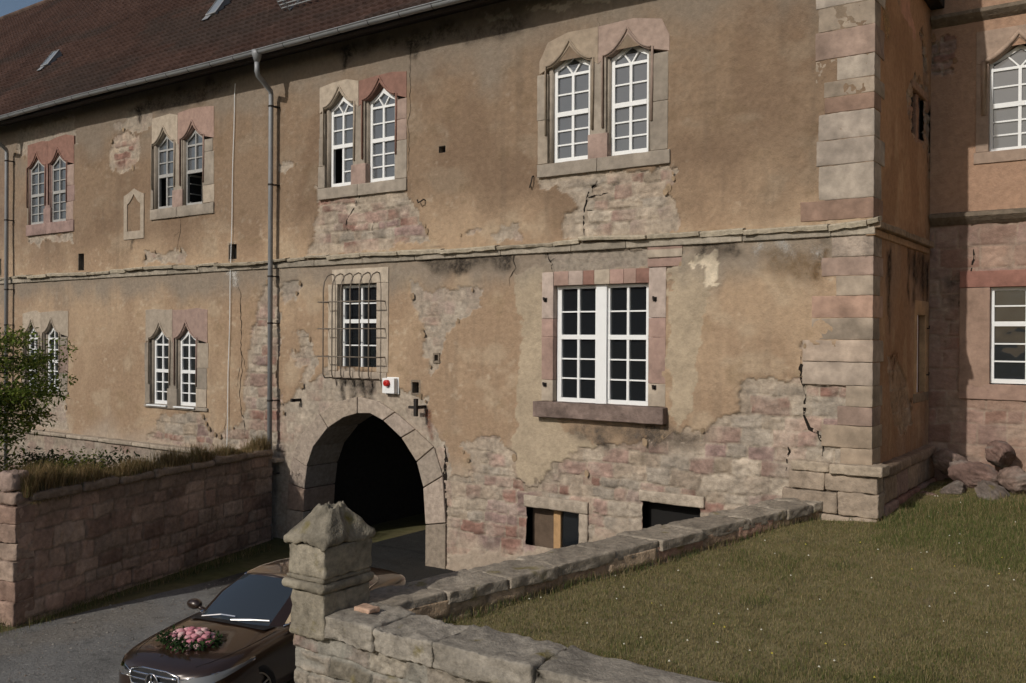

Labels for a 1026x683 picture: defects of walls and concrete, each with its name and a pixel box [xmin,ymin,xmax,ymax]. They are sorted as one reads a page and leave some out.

flaking render [110,109,152,173]
flaking render [307,186,429,255]
flaking render [539,164,719,286]
flaking render [147,280,870,565]
crack [798,353,824,456]